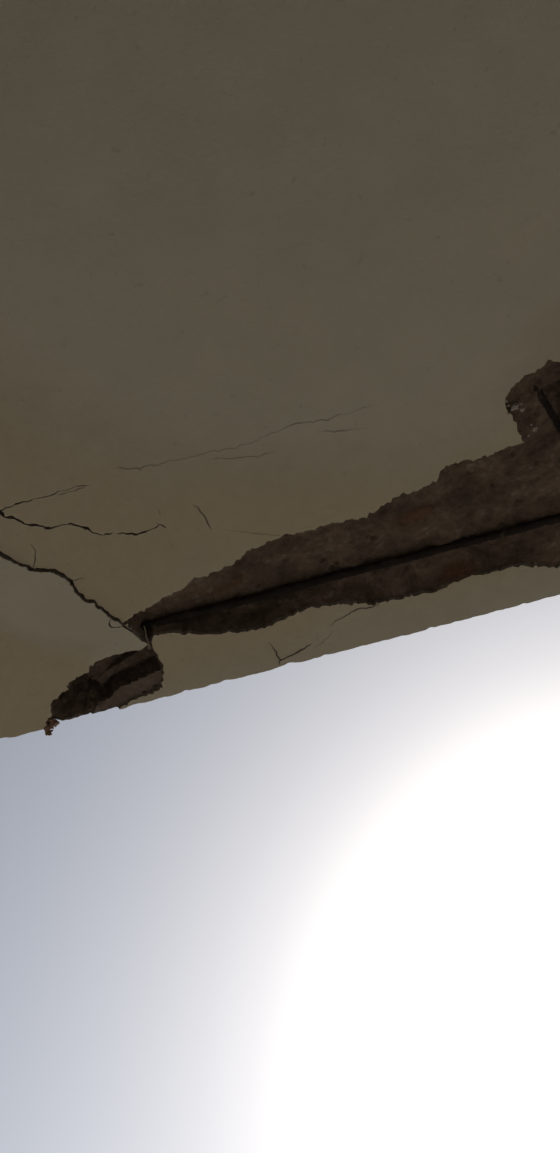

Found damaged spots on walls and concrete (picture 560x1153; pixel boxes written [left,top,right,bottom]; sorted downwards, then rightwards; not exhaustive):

crack [0,485,166,628]
spalling [44,359,560,736]